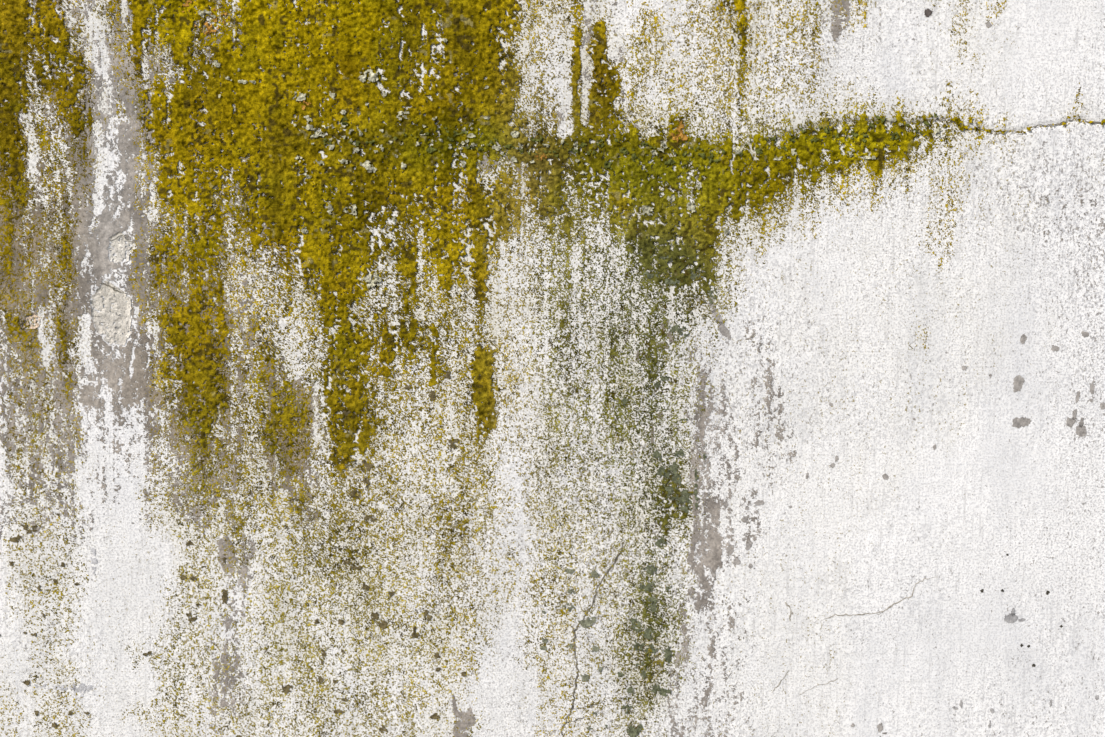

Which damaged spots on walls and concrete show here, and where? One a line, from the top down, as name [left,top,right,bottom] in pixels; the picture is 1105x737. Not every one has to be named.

damp [605,0,868,161]
damp [950,0,976,72]
crack [841,118,1101,131]
damp [119,82,1018,737]
damp [0,338,97,737]
crack [821,577,933,621]